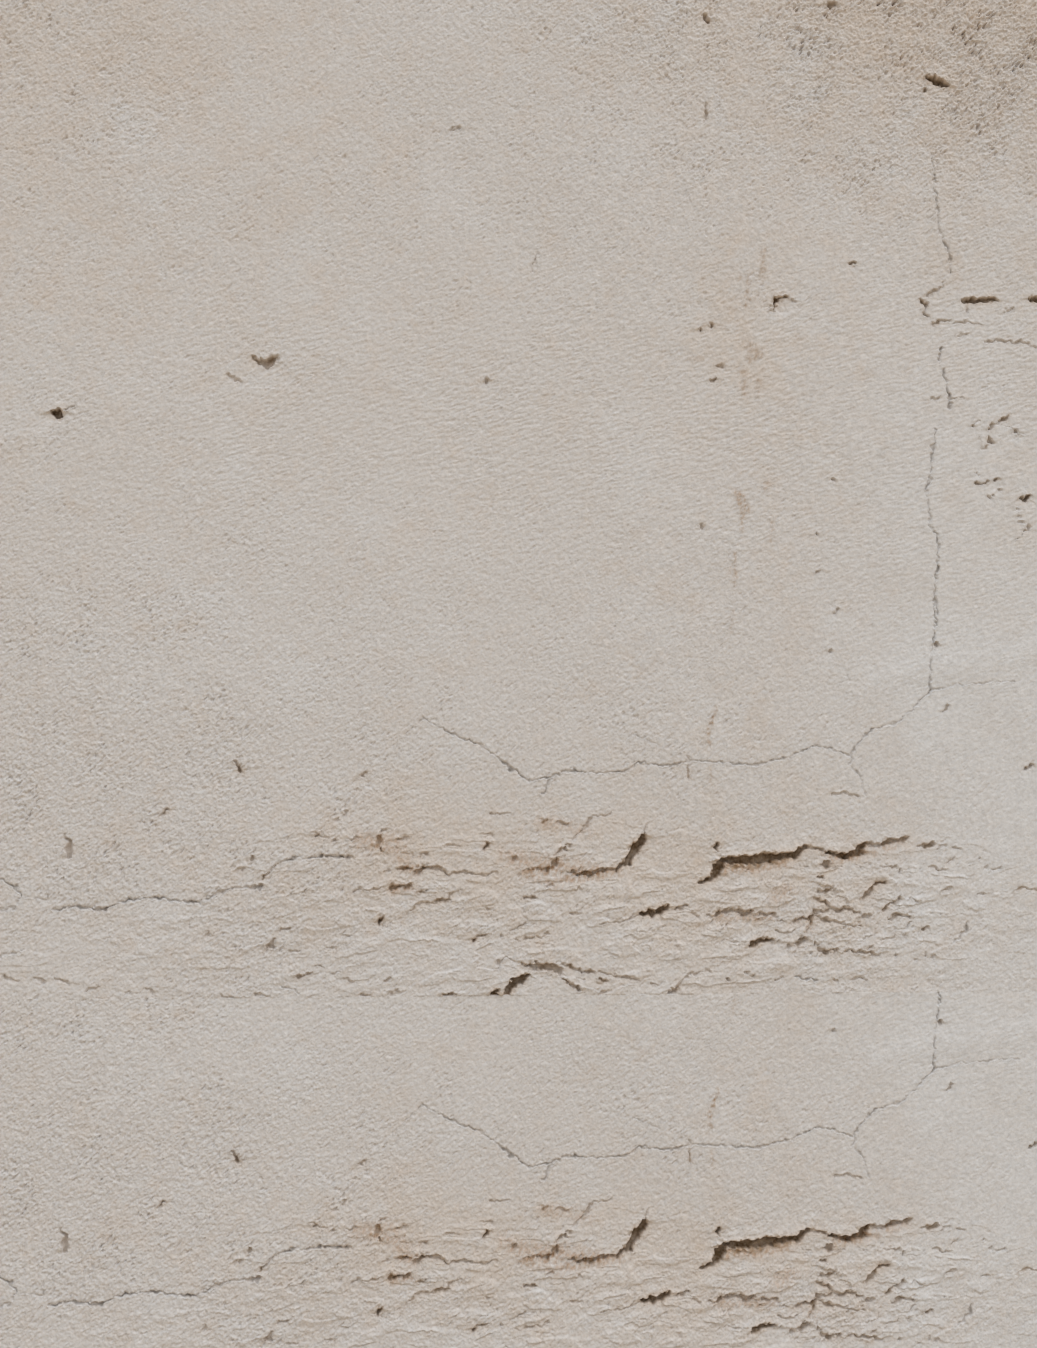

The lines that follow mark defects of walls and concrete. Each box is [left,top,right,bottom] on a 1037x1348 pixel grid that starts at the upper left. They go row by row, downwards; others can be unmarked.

crack [396,152,1037,798]
crack [0,851,355,915]
crack [0,1241,354,1309]